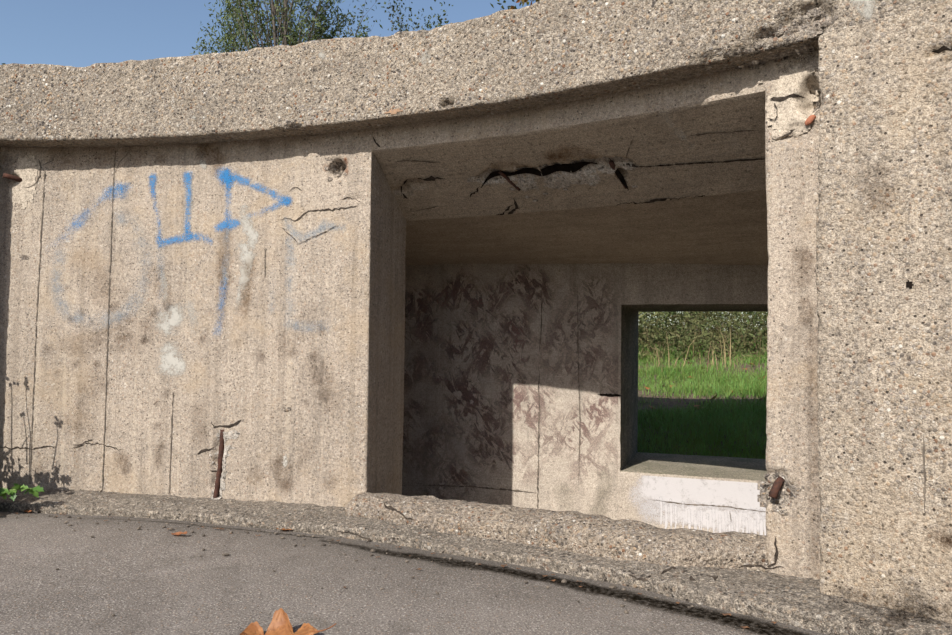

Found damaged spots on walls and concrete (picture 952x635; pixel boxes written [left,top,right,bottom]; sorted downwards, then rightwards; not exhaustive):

peeling [723,4,838,140]
crack [691,93,805,137]
crack [372,136,445,212]
crack [470,137,765,215]
crack [280,187,360,244]